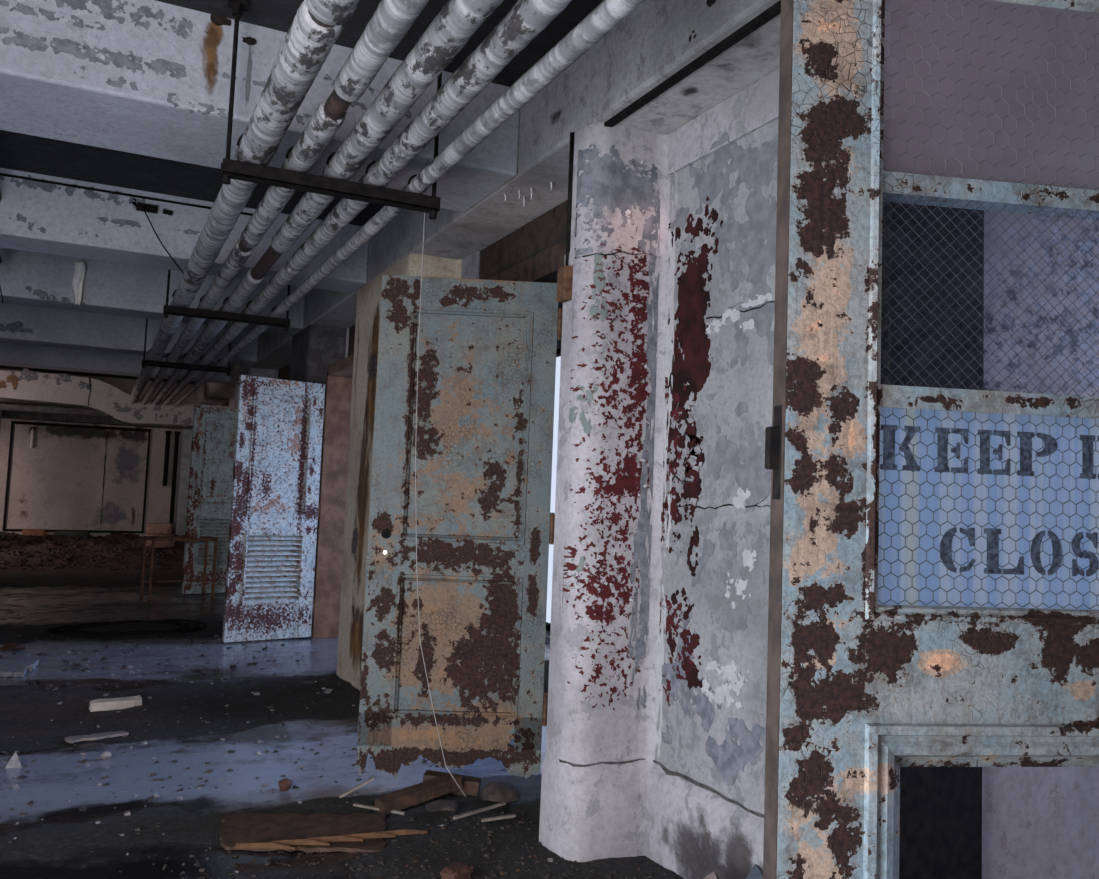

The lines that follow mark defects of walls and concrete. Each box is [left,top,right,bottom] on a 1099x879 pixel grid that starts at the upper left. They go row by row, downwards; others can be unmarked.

peeling [0,0,193,39]
spalling [210,14,231,26]
peeling [0,27,187,91]
corrosion [203,22,223,89]
peeling [167,93,228,119]
peeling [560,131,778,786]